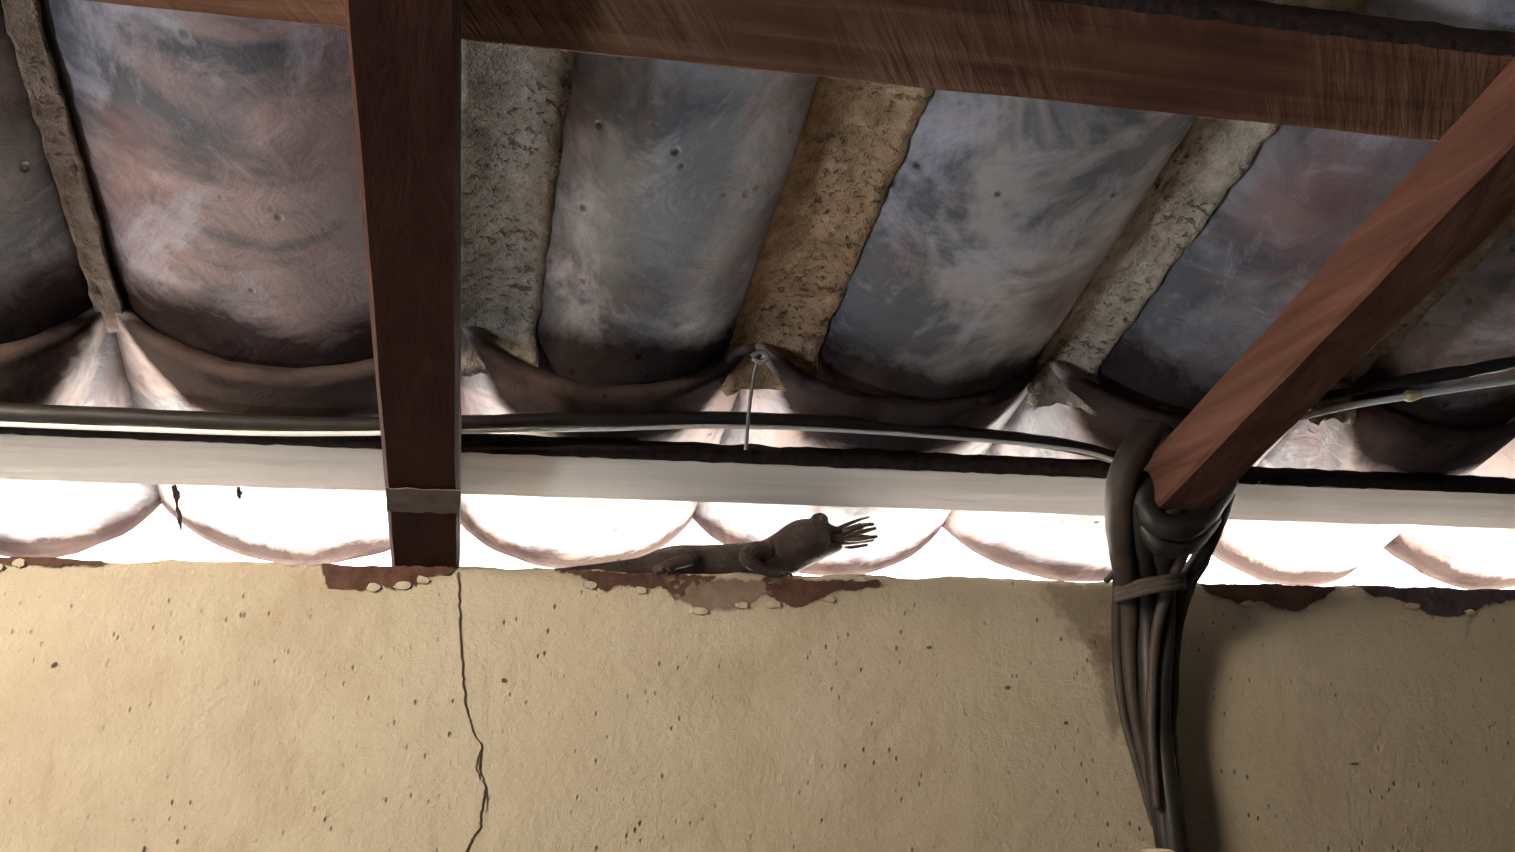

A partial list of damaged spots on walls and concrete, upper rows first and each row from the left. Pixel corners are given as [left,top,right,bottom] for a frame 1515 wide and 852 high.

spalling [321,563,454,593]
peeling [554,569,881,615]
crack [457,572,488,852]